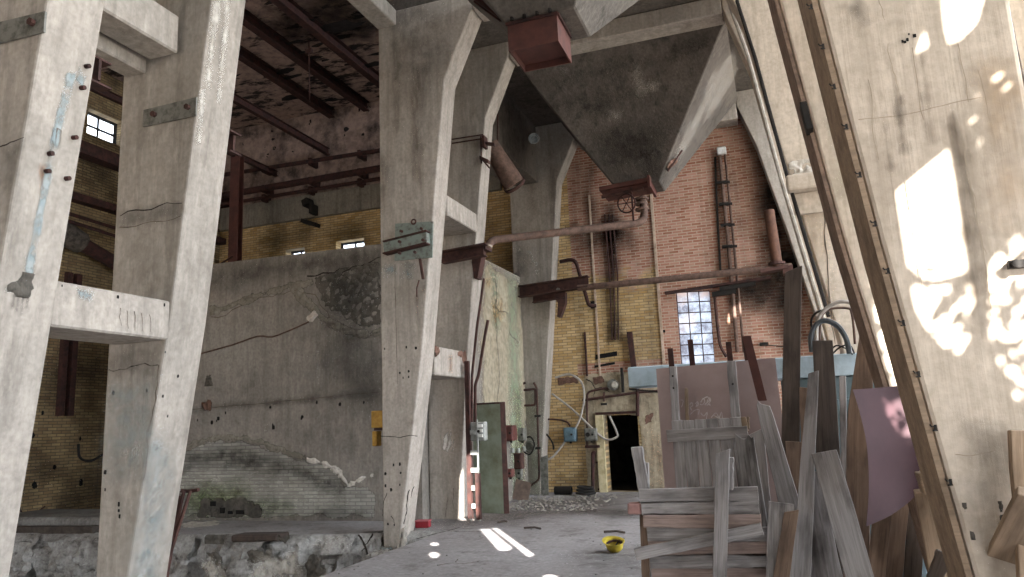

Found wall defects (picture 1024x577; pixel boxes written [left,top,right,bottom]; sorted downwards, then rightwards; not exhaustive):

damp [208,2,228,80]
crack [119,202,181,228]
crack [211,257,379,318]
flaking render [315,262,381,327]
flaking render [179,400,402,518]